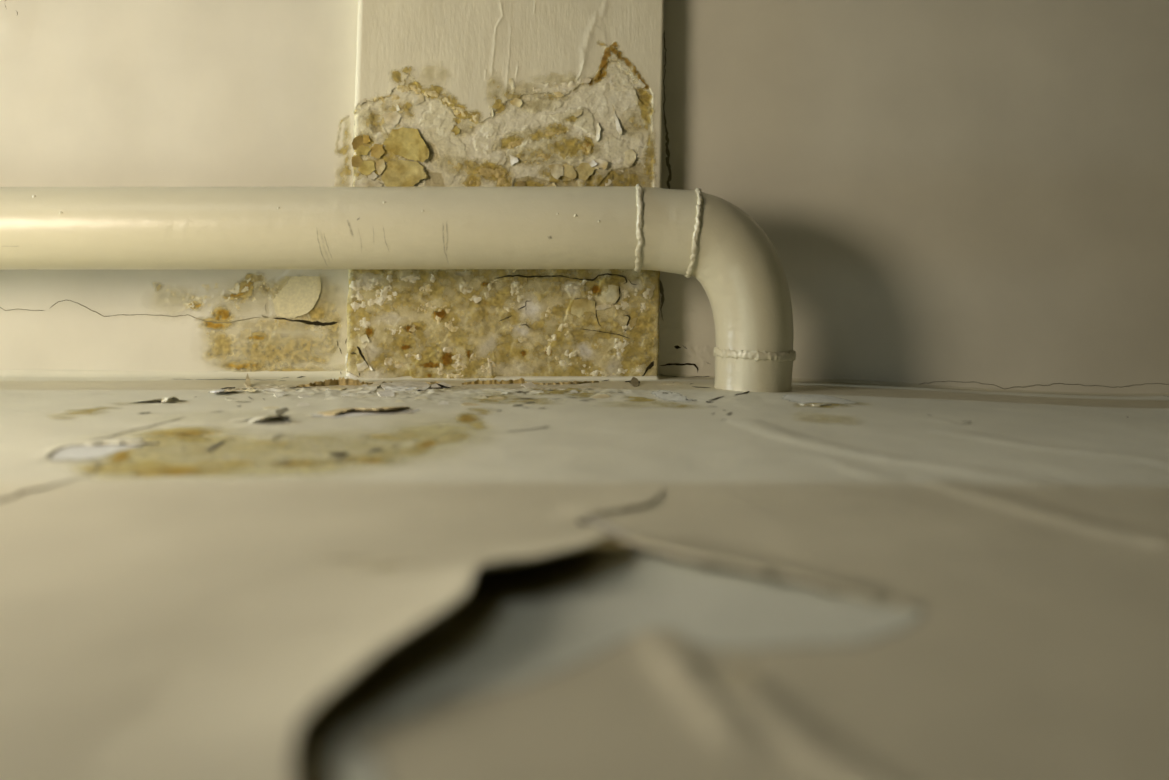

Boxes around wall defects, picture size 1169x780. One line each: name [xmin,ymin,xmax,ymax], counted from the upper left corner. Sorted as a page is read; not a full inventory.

peeling [351,60,653,187]
crack [0,300,338,326]
crack [186,376,311,389]
damp [189,274,319,371]
flaking render [209,269,695,410]
damp [302,269,660,462]
peeling [28,417,185,470]
damp [87,428,334,477]
crack [0,468,101,502]